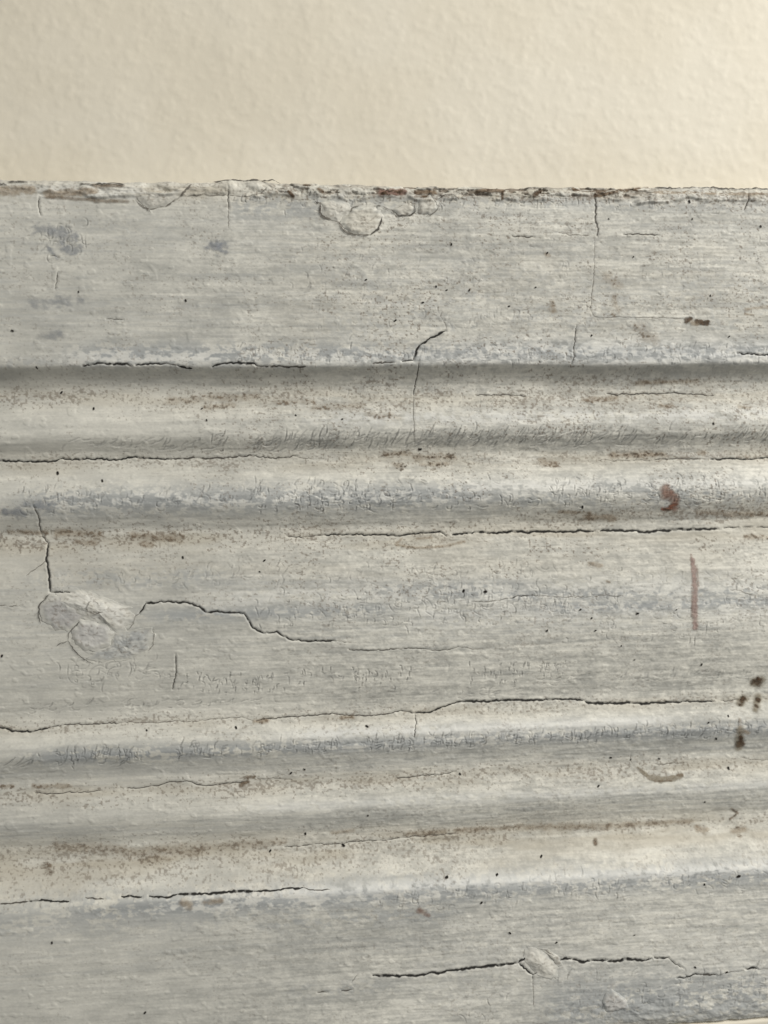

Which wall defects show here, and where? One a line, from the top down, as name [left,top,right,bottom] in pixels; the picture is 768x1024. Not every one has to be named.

spalling [304,184,458,236]
crack [559,194,682,362]
crack [84,361,306,369]
crack [374,313,447,437]
crack [0,454,308,463]
corrosion [661,485,679,511]
crack [26,506,71,593]
crack [288,526,768,538]
crack [140,601,484,651]
crack [0,698,736,737]
crack [1,887,330,904]
crack [560,957,768,979]